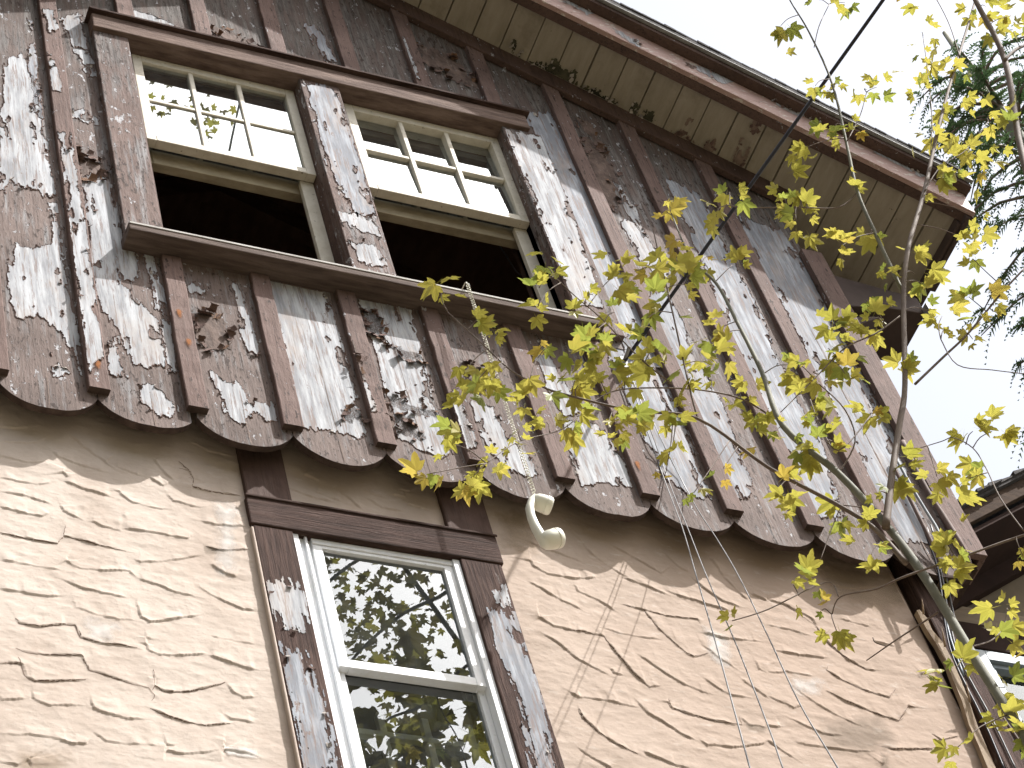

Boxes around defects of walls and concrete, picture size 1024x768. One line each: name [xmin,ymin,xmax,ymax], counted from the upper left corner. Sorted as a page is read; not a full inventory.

peeling [0,8,181,419]
peeling [185,280,261,357]
peeling [209,370,278,425]
peeling [303,81,389,268]
peeling [270,281,539,478]
peeling [504,110,713,501]
peeling [649,291,753,501]
peeling [665,177,848,522]
peeling [738,215,928,545]
peeling [266,576,342,768]
peeling [486,584,555,768]